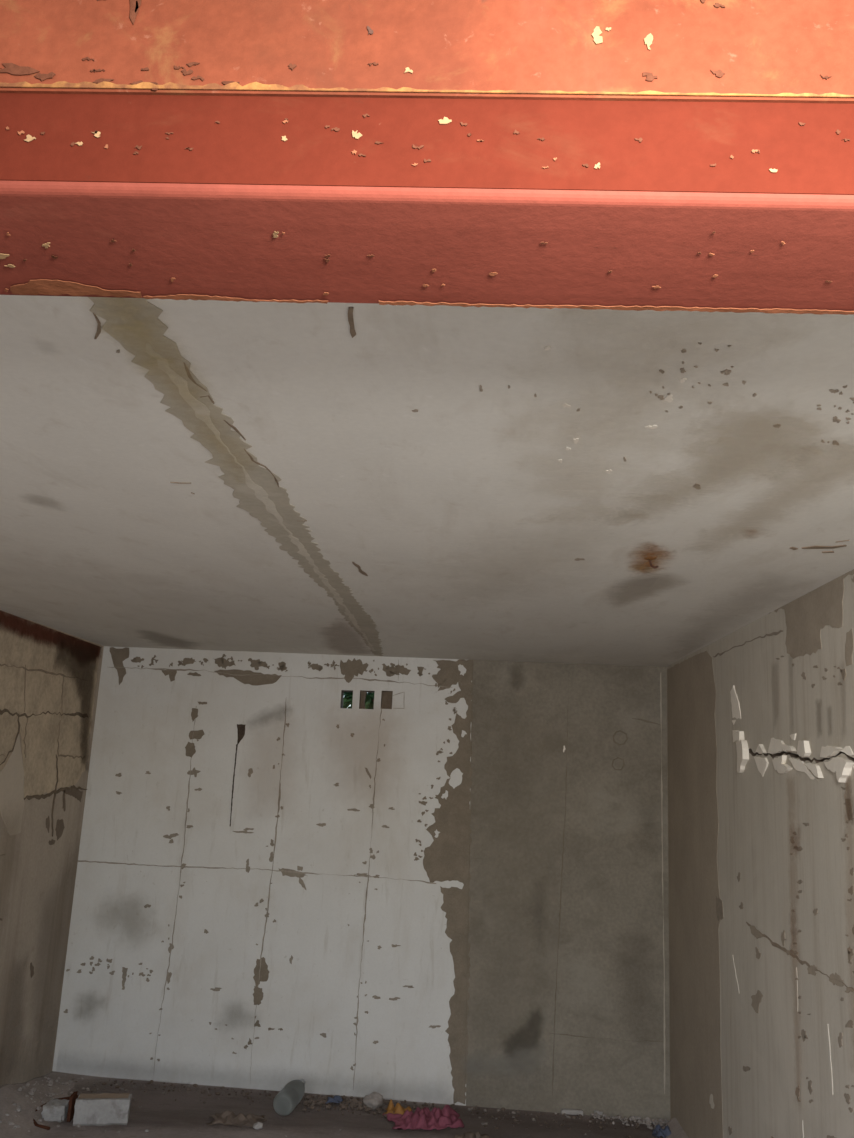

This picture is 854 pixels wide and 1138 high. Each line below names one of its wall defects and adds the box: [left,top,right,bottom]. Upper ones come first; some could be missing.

peeling [130,0,141,25]
peeling [592,26,611,44]
peeling [775,575,854,688]
crack [0,664,87,837]
spalling [0,610,288,845]
peeling [88,297,474,1104]
crack [730,685,854,783]
crack [746,922,854,991]